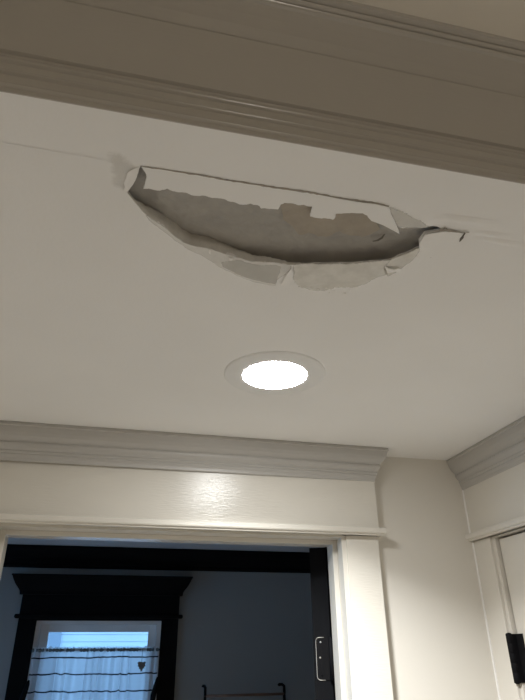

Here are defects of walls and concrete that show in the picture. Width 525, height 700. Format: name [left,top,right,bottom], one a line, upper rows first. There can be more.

peeling [283,191,399,233]
peeling [419,232,463,250]